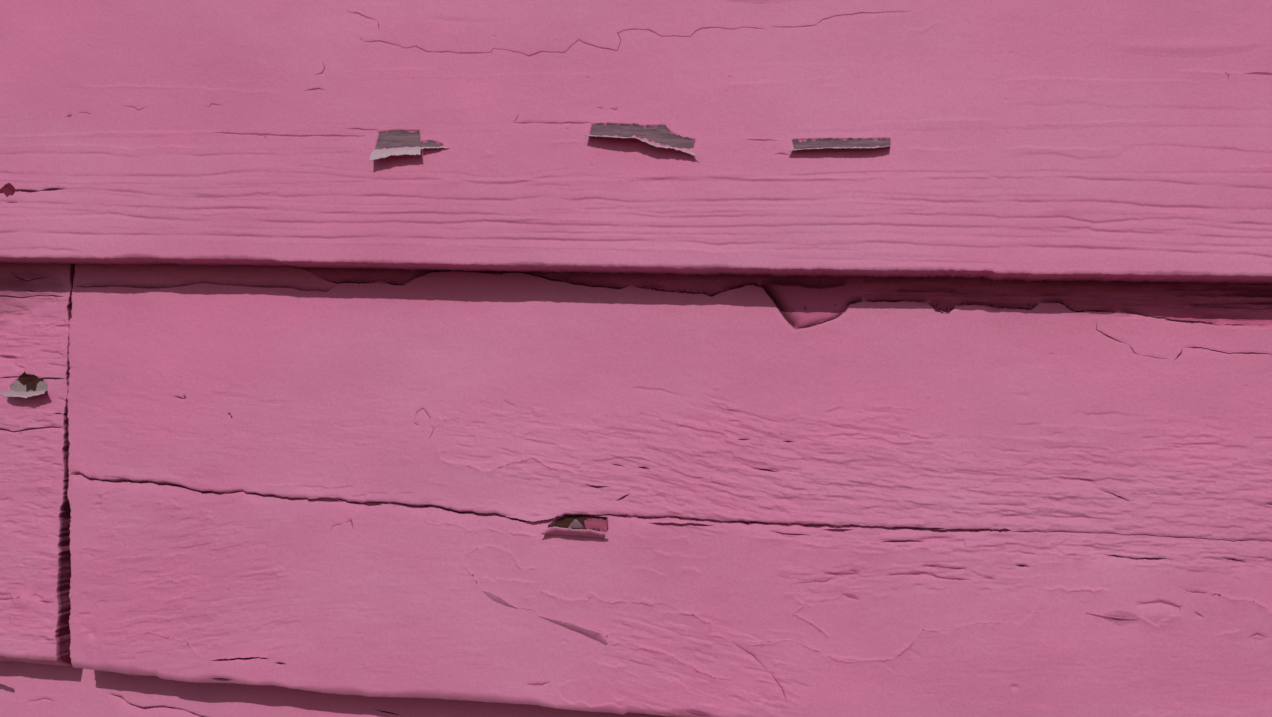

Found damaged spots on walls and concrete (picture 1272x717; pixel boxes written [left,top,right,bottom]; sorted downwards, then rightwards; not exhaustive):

crack [347,11,907,56]
peeling [369,129,449,162]
peeling [585,122,698,157]
peeling [789,137,890,151]
peeling [78,266,1272,329]
peeling [0,371,48,398]
peeling [506,514,608,538]
crack [72,464,1272,580]
crack [794,570,860,600]
crack [1138,591,1222,618]
crack [732,642,787,702]